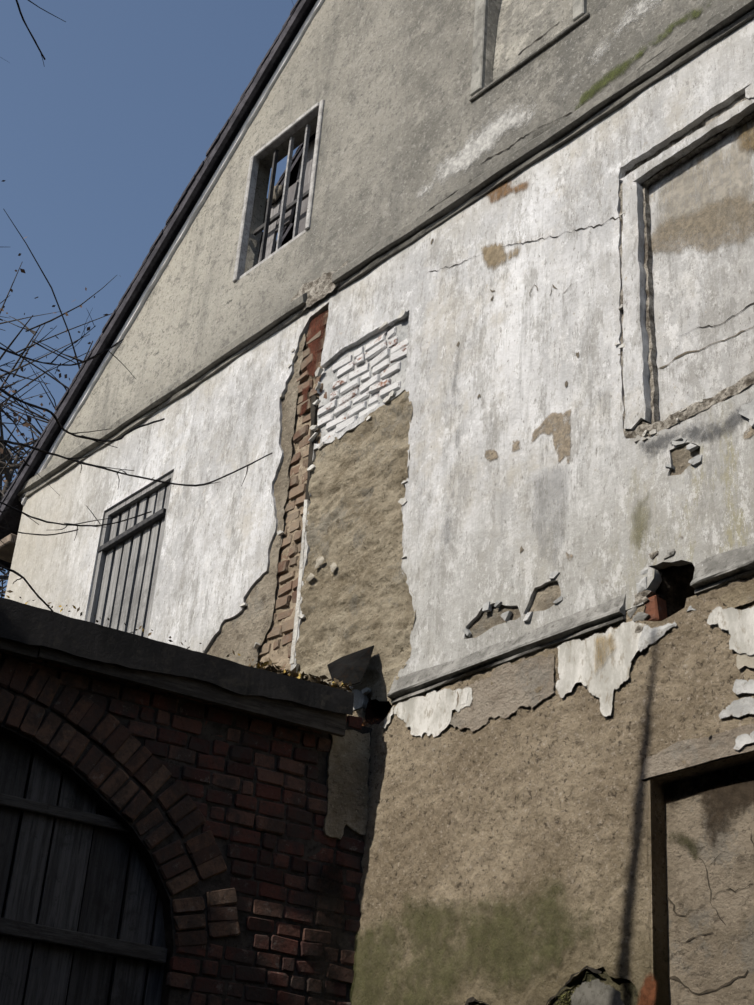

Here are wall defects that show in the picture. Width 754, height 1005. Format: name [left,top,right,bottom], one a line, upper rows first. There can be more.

damp [617,0,657,34]
damp [418,105,531,196]
crack [426,217,620,274]
flaking render [614,183,754,476]
crack [658,302,754,369]
peeling [512,410,571,464]
flaking render [206,309,409,671]
flaking render [348,549,703,737]
flaking render [707,578,754,719]
flaking render [733,731,754,750]
crack [666,854,754,943]
crack [668,970,748,995]